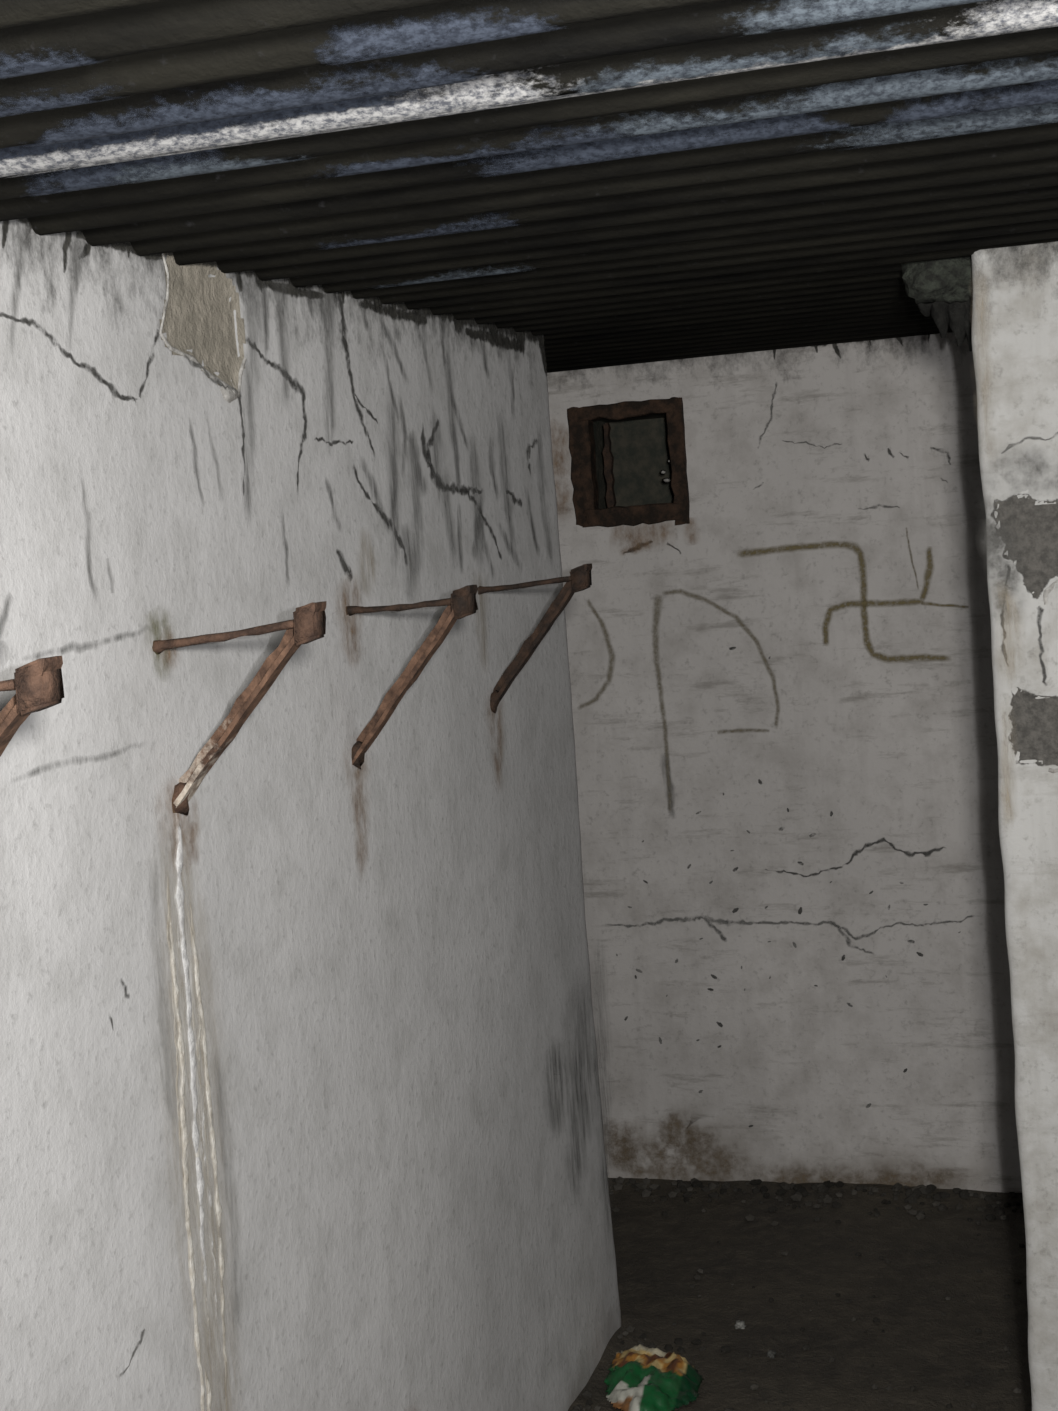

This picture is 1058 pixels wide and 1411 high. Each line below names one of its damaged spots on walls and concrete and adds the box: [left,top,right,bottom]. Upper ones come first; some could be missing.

crack [0,313,159,401]
flaking render [159,253,246,403]
crack [237,395,245,493]
crack [247,292,407,563]
crack [421,422,522,566]
crack [336,550,352,578]
flaking render [991,494,1058,605]
flaking render [1008,687,1058,773]
crack [777,838,943,877]
crack [614,916,972,953]
damp [167,813,227,1411]